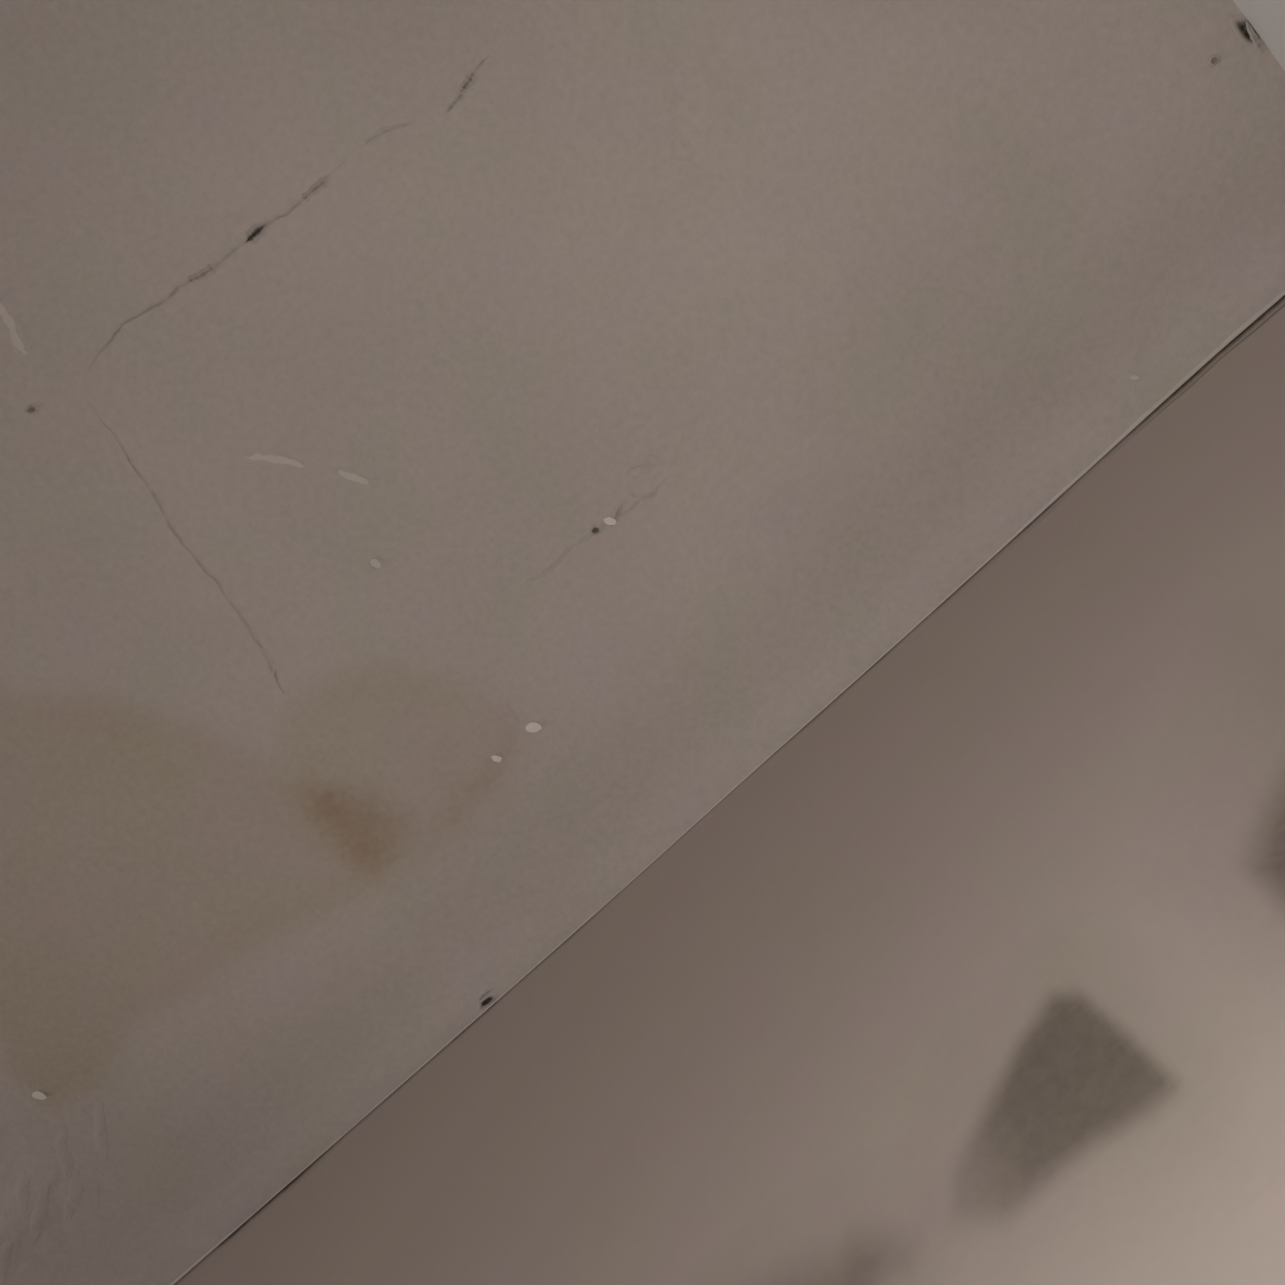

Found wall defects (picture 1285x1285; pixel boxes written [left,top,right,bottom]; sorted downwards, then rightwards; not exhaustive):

crack [87,123,411,369]
crack [444,55,490,115]
leakage [0,651,541,1122]
crack [169,290,1285,1285]